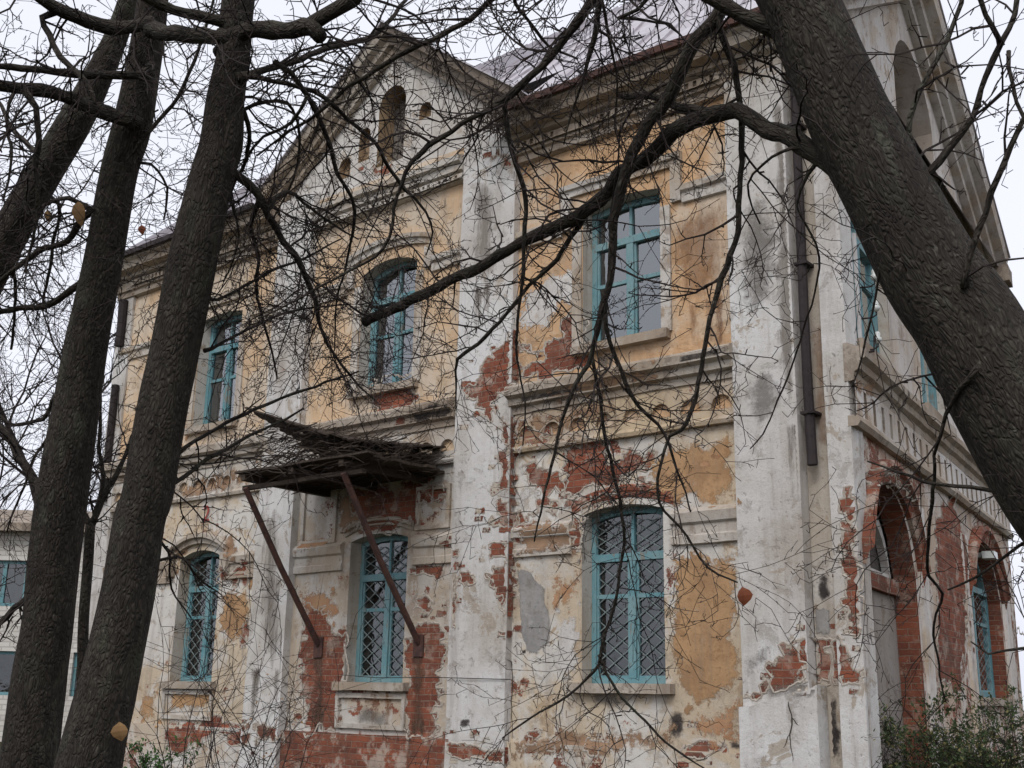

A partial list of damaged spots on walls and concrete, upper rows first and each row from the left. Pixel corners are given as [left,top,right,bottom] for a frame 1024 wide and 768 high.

peeling [215,529,255,649]
flaking render [139,587,349,757]
peeling [401,264,866,768]
water stain [819,576,829,599]